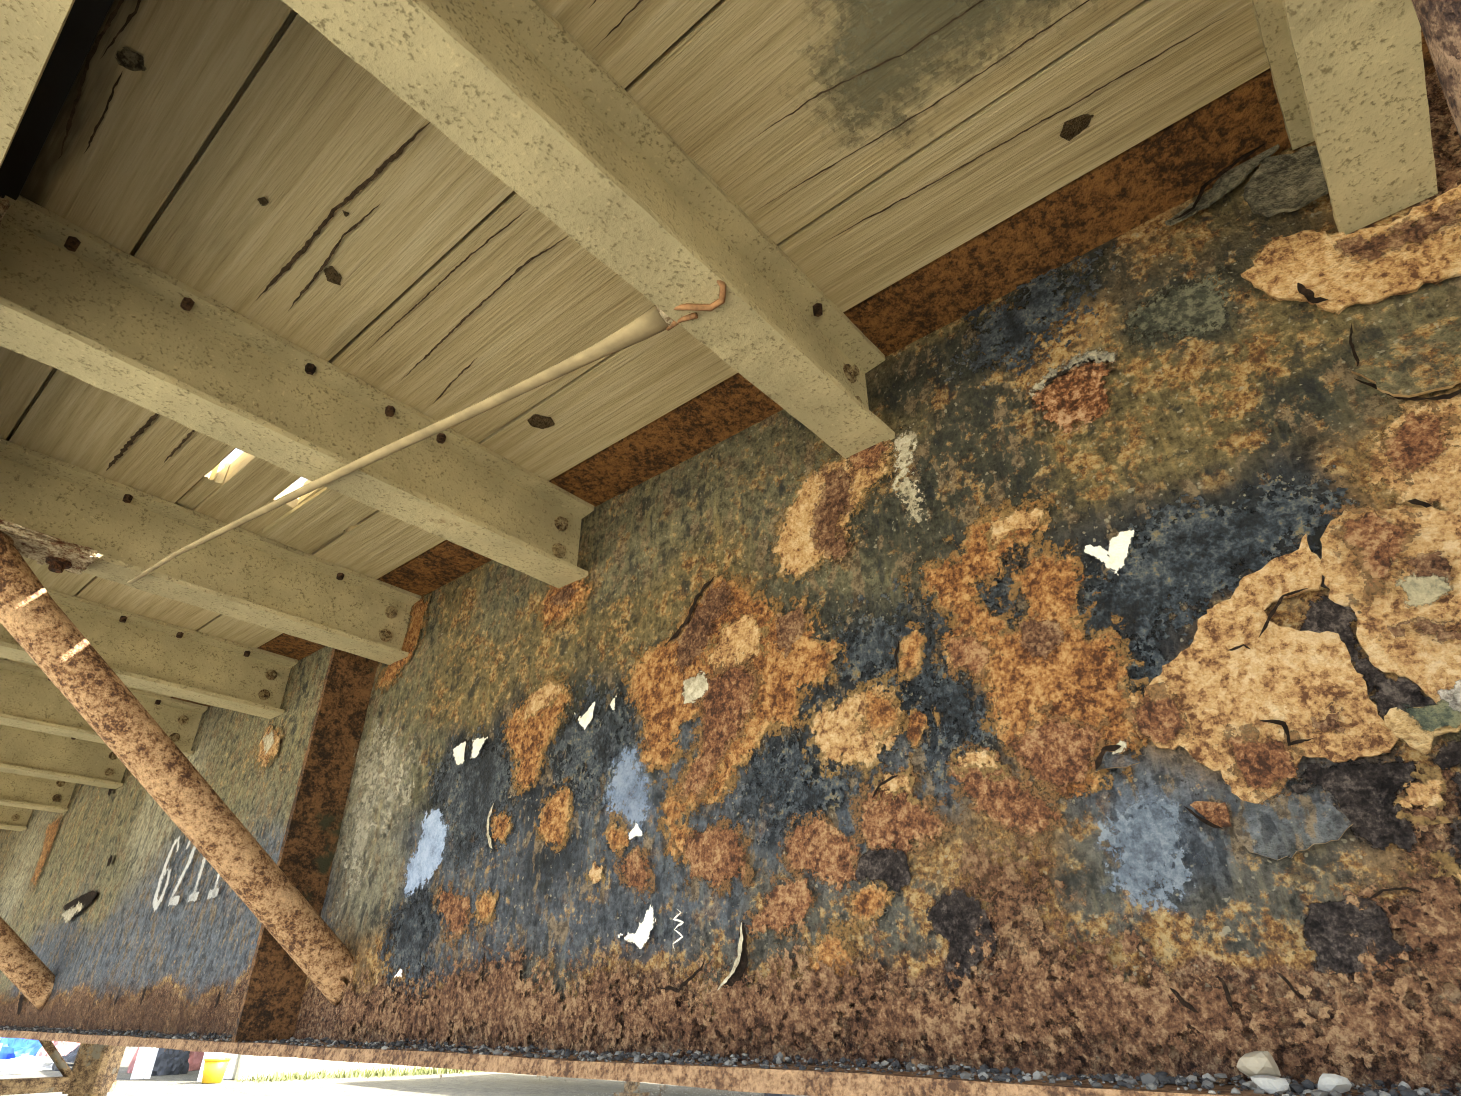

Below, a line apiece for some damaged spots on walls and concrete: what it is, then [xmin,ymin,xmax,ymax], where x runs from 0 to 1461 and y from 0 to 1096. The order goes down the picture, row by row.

peeling [1165,144,1328,226]
peeling [1351,311,1461,398]
corrosion [1028,347,1116,434]
corrosion [253,718,284,771]
peeling [453,737,488,765]
peeling [574,696,617,730]
corrosion [327,385,1461,1094]
peeling [1384,700,1461,755]
corrosion [28,814,63,891]
peeling [629,824,642,839]
peeling [618,904,656,949]
peeling [718,922,743,990]